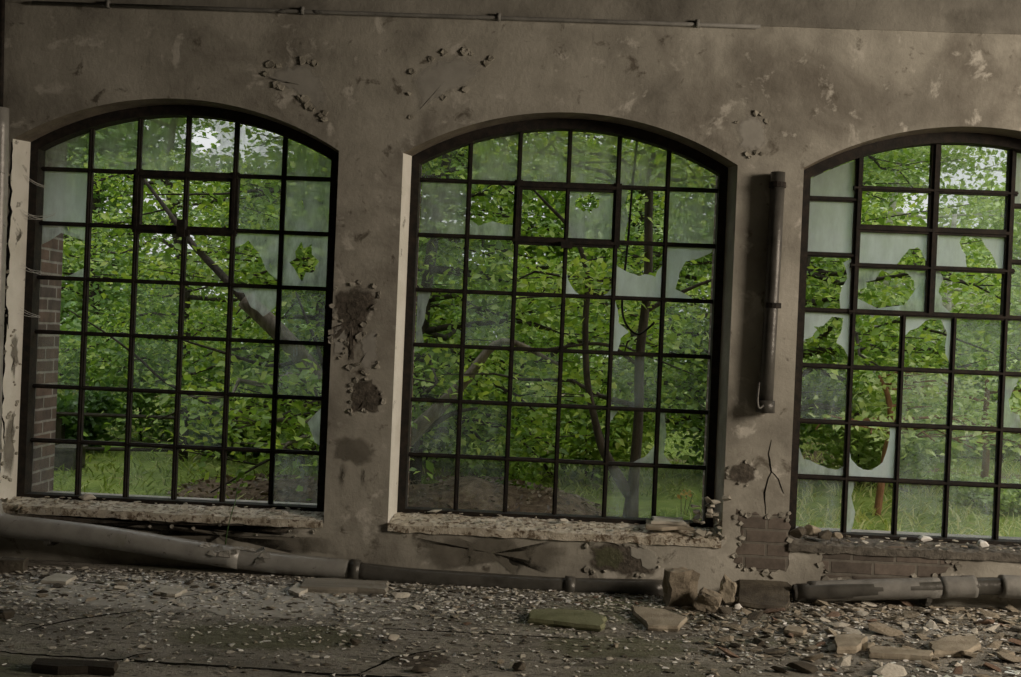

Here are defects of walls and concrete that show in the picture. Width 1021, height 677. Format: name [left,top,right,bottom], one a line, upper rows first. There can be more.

damp [337,438,372,482]
flaking render [726,460,757,486]
flaking render [690,495,794,578]